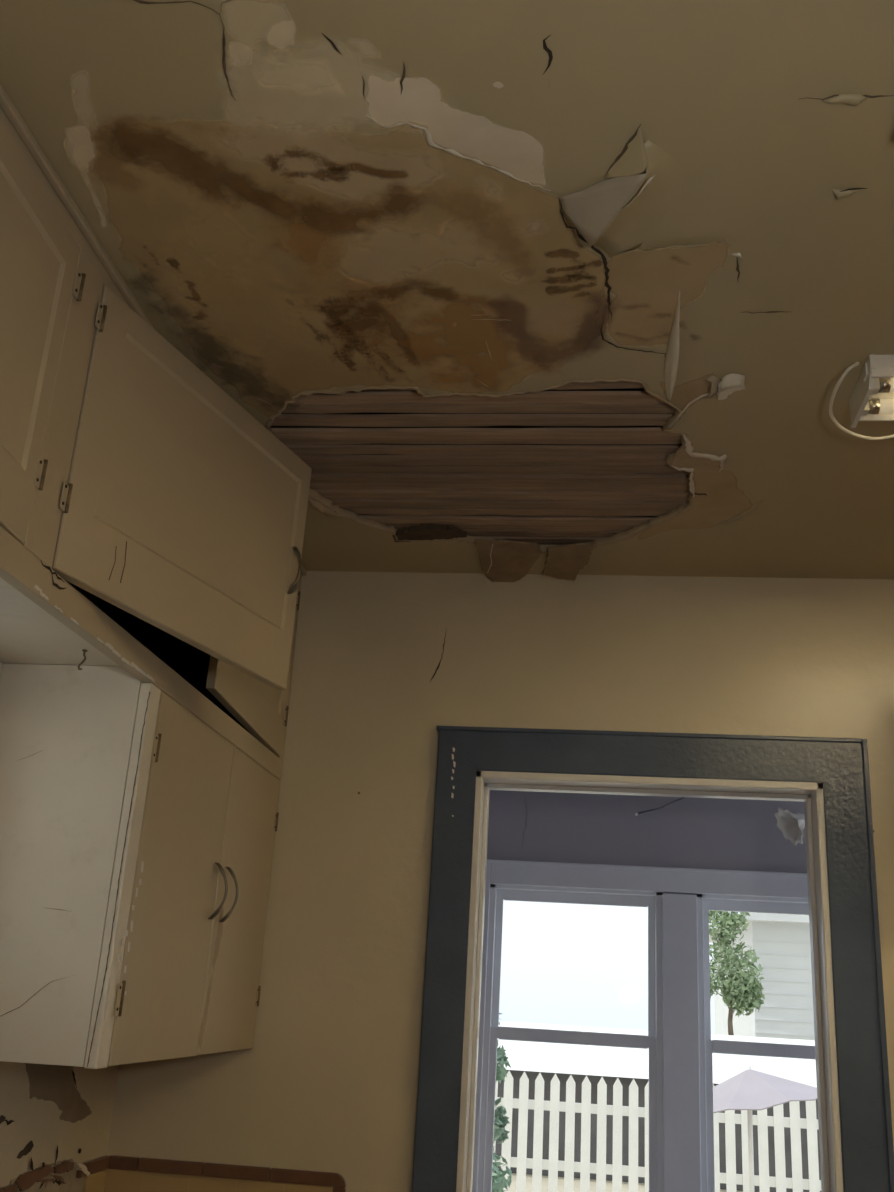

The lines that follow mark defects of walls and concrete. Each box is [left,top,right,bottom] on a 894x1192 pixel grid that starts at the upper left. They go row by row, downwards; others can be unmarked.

crack [134,0,236,100]
crack [543,36,553,74]
crack [801,94,894,106]
peeling [366,76,550,191]
crack [832,188,867,199]
leakage [90,121,611,416]
flaking render [264,291,746,582]
peeling [25,1063,91,1123]
spalling [9,1141,90,1192]